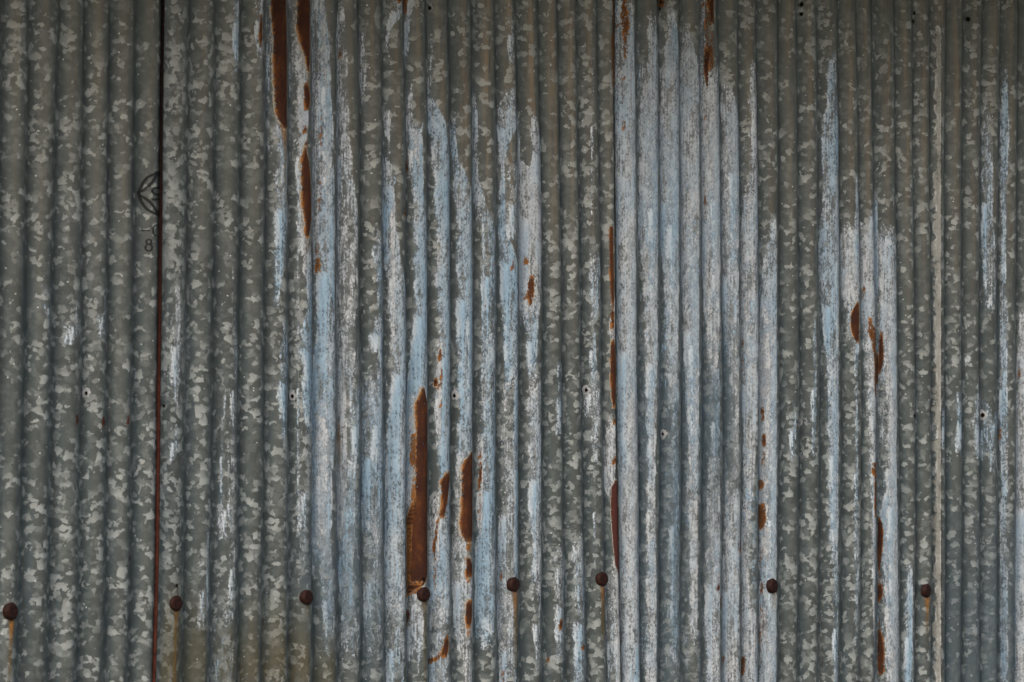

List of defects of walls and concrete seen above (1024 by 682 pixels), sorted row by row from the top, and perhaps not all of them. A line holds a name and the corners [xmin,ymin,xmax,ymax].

rust [258,0,310,144]
rust [702,0,714,86]
rust [298,117,323,273]
rust [510,257,535,306]
rust [608,225,616,425]
rust [849,286,884,397]
rust [406,349,482,623]
rust [610,479,619,574]